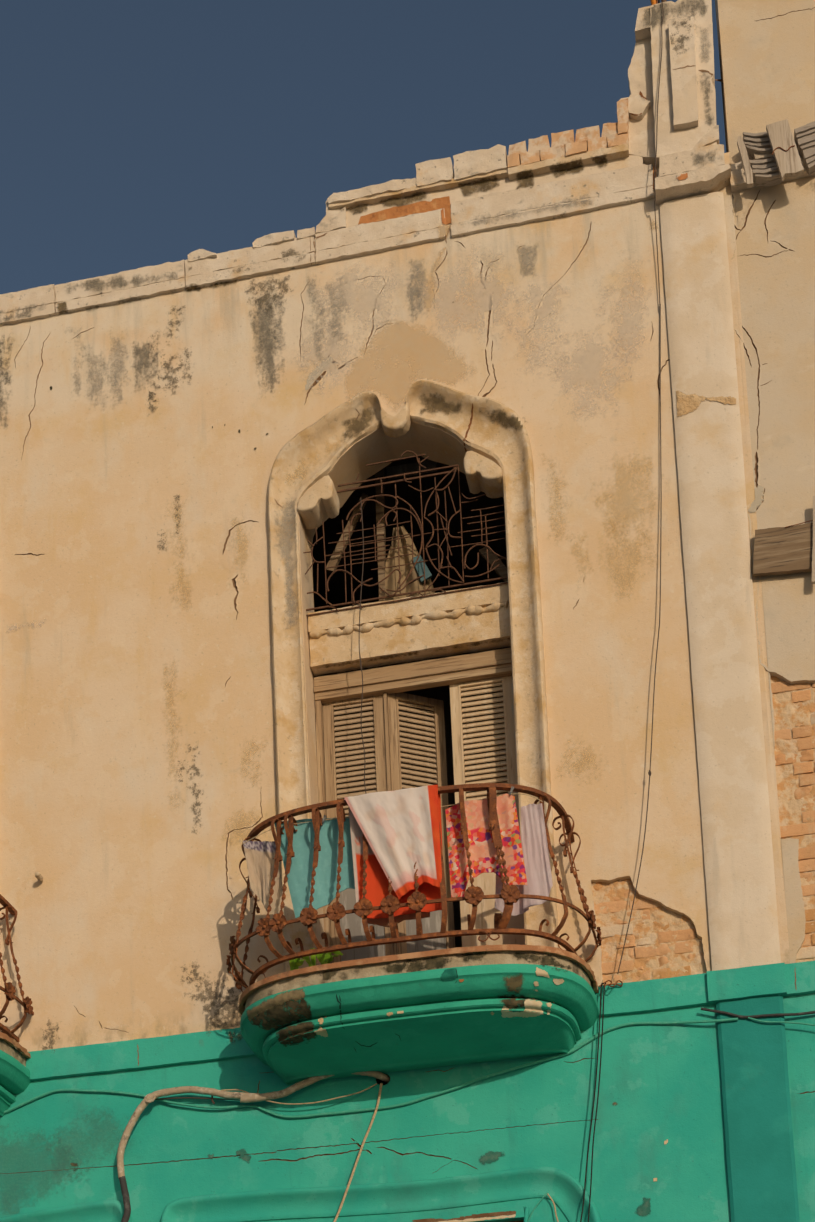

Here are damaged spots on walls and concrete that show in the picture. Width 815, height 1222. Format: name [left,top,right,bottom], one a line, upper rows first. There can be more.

crack [14,327,94,460]
leakage [90,335,191,411]
leakage [233,267,290,387]
crack [299,233,393,405]
crack [526,222,592,335]
spalling [676,391,736,417]
crack [731,190,794,260]
crack [222,500,283,620]
crack [225,792,264,900]